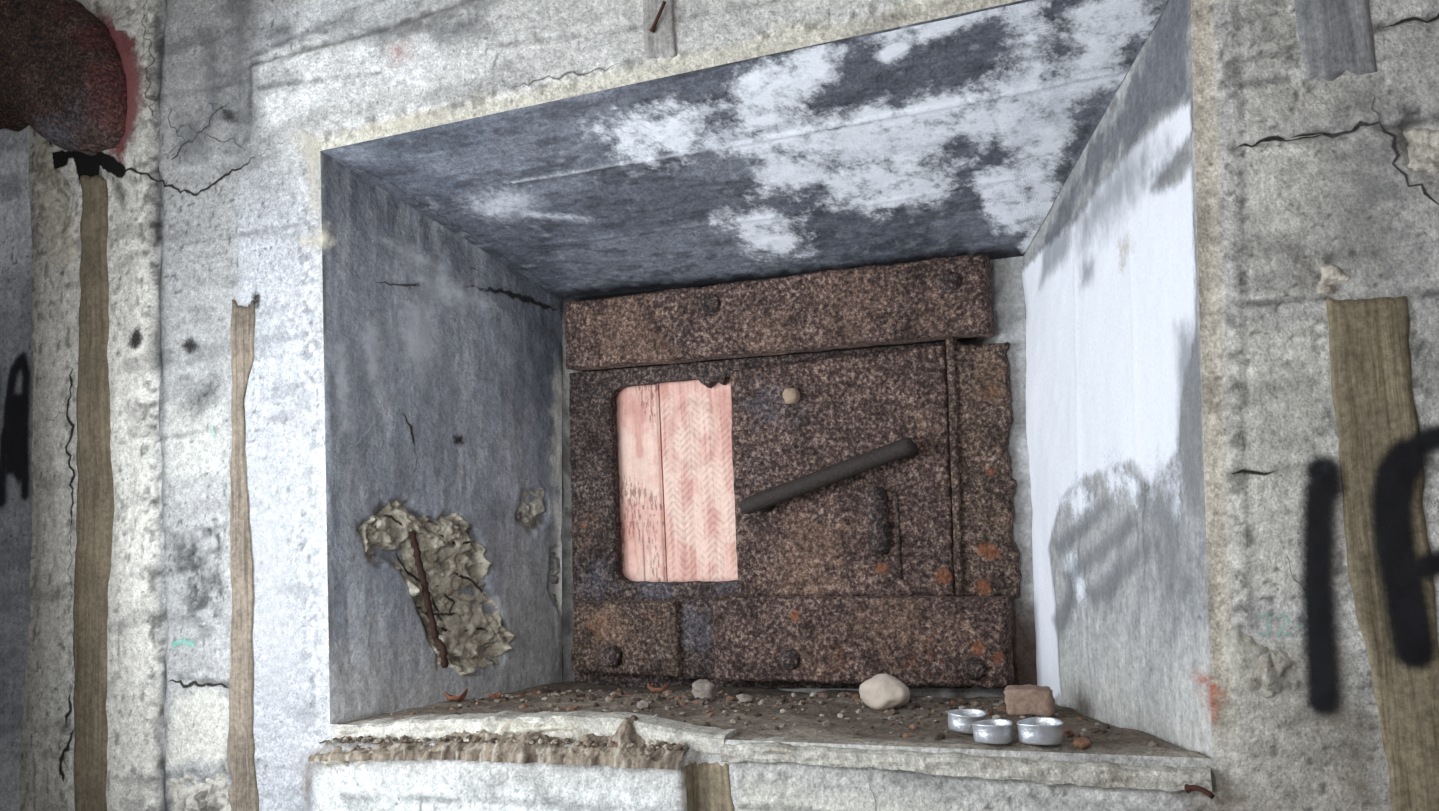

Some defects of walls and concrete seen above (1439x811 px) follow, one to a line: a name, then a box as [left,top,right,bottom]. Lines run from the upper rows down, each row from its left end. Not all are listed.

crack [1383,14,1439,28]
crack [125,1,289,196]
crack [1236,96,1439,205]
water stain [522,211,586,219]
crack [47,369,75,600]
spalling [357,500,515,676]
crack [59,681,73,781]
crack [168,679,228,696]